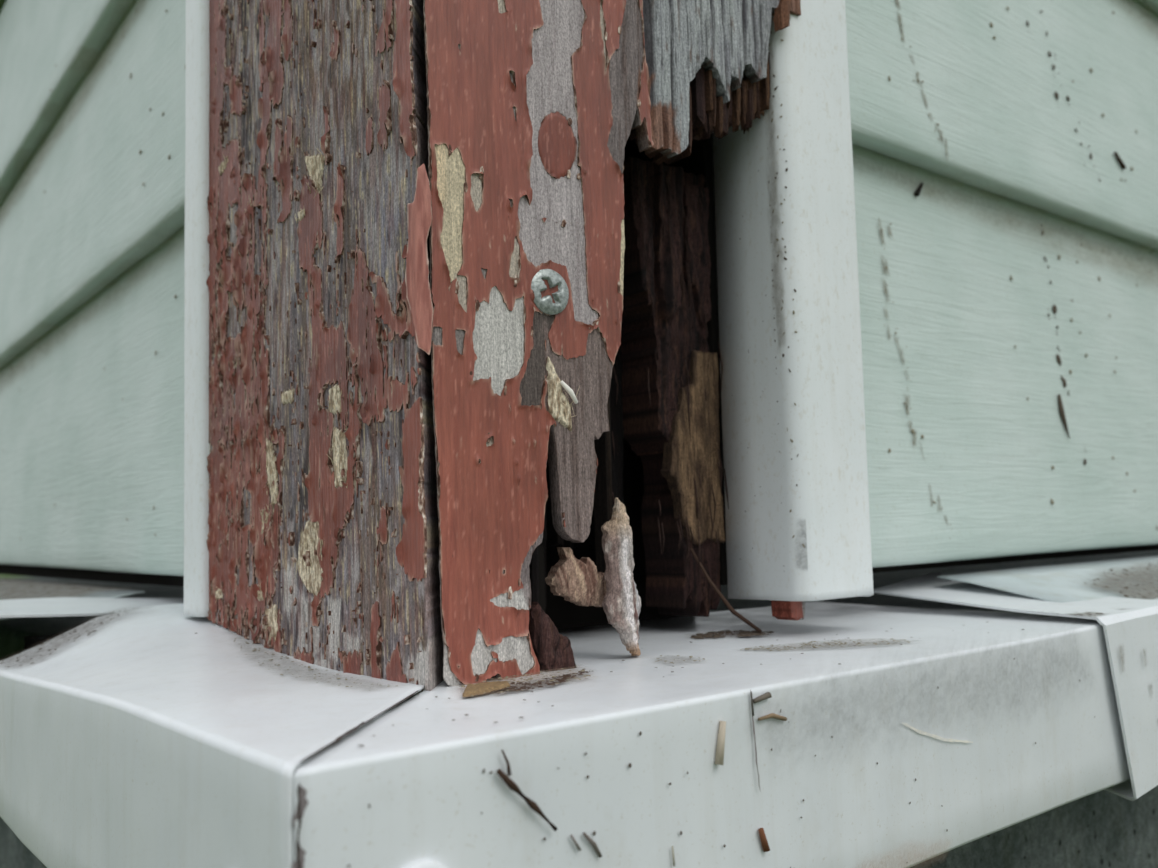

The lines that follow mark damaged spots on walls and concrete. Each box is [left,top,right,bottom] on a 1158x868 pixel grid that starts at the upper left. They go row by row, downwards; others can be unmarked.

peeling [600,0,643,173]
peeling [773,0,791,32]
peeling [617,219,625,295]
peeling [206,0,613,692]